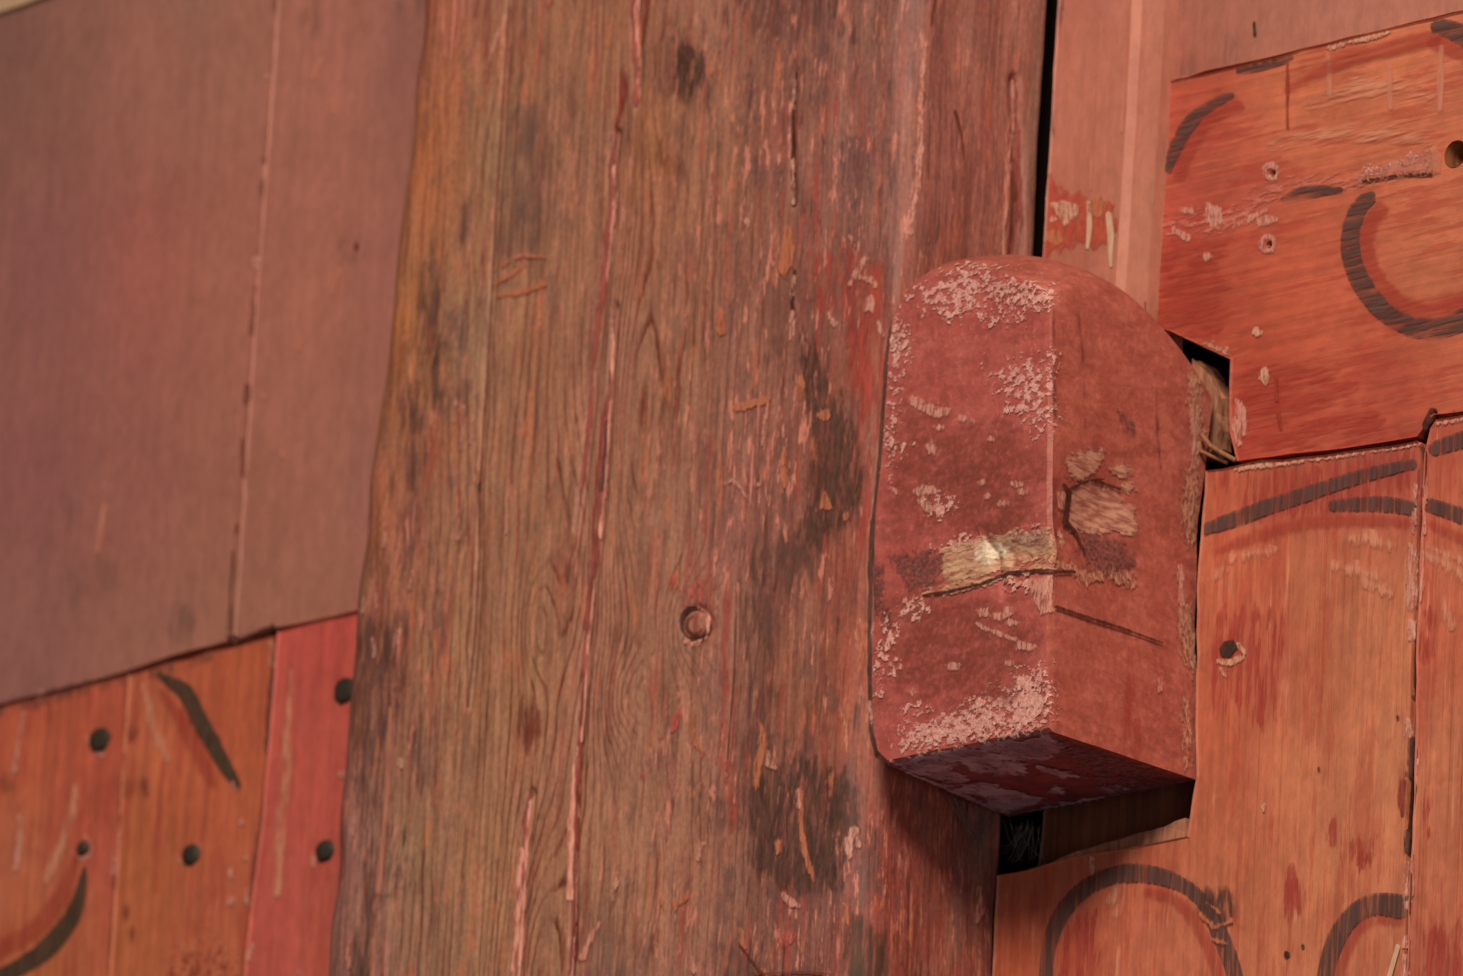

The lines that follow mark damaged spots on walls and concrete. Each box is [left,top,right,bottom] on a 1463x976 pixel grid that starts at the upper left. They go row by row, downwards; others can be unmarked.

peeling [1043,174,1117,267]
peeling [848,256,1063,521]
peeling [871,447,1169,814]